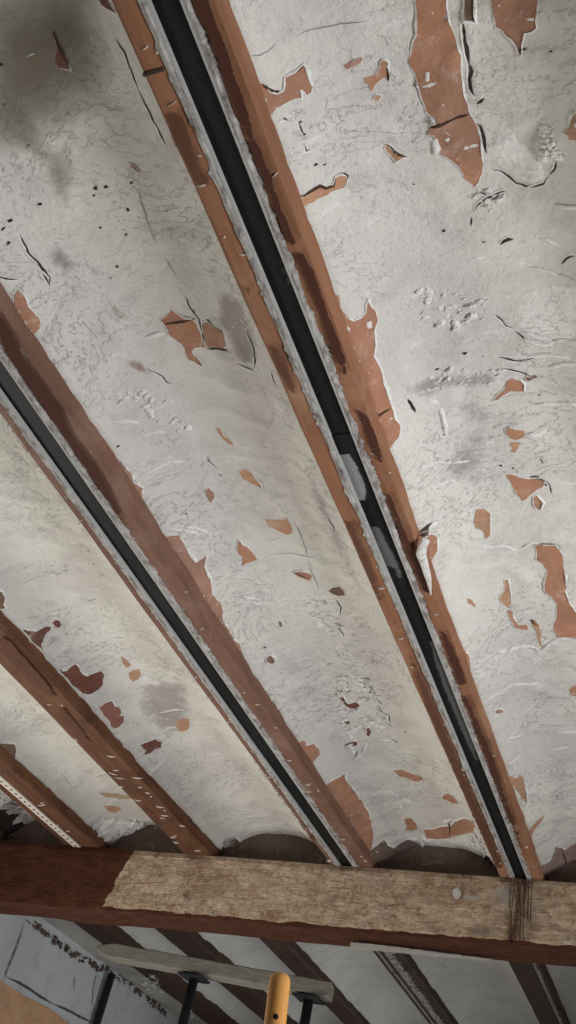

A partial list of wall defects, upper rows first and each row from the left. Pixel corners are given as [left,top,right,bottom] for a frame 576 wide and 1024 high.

flaking render [260,62,314,115]
flaking render [407,0,484,188]
crack [459,24,556,226]
flaking render [300,172,349,207]
crack [0,235,51,287]
flaking render [159,308,227,367]
flaking render [498,543,576,648]
flaking render [60,663,105,694]
flaking render [327,773,494,866]